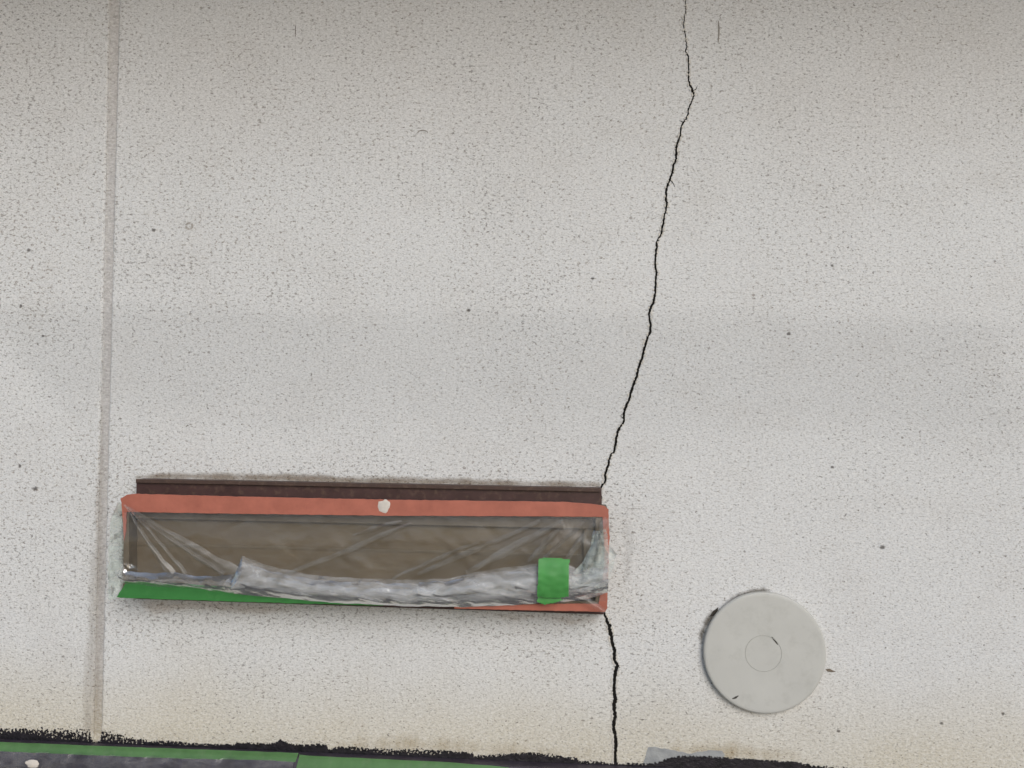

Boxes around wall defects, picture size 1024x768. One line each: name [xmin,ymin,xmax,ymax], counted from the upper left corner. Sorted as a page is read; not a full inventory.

crack [600,0,698,500]
crack [602,611,621,765]